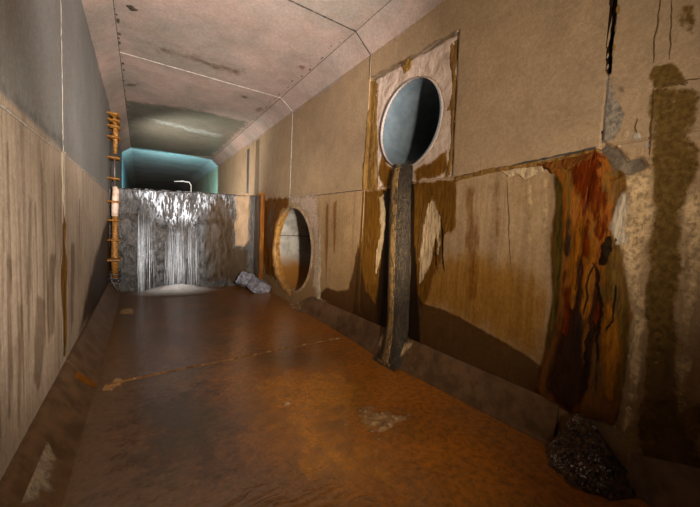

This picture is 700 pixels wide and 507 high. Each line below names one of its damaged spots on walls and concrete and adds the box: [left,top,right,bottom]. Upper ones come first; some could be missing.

crack [606,0,620,75]
crack [653,0,672,59]
damp [84,218,110,319]
peeling [291,194,322,300]
spalling [362,30,656,432]
rust [535,150,633,425]
crack [582,236,617,395]
damp [638,88,700,468]
damp [21,443,55,503]